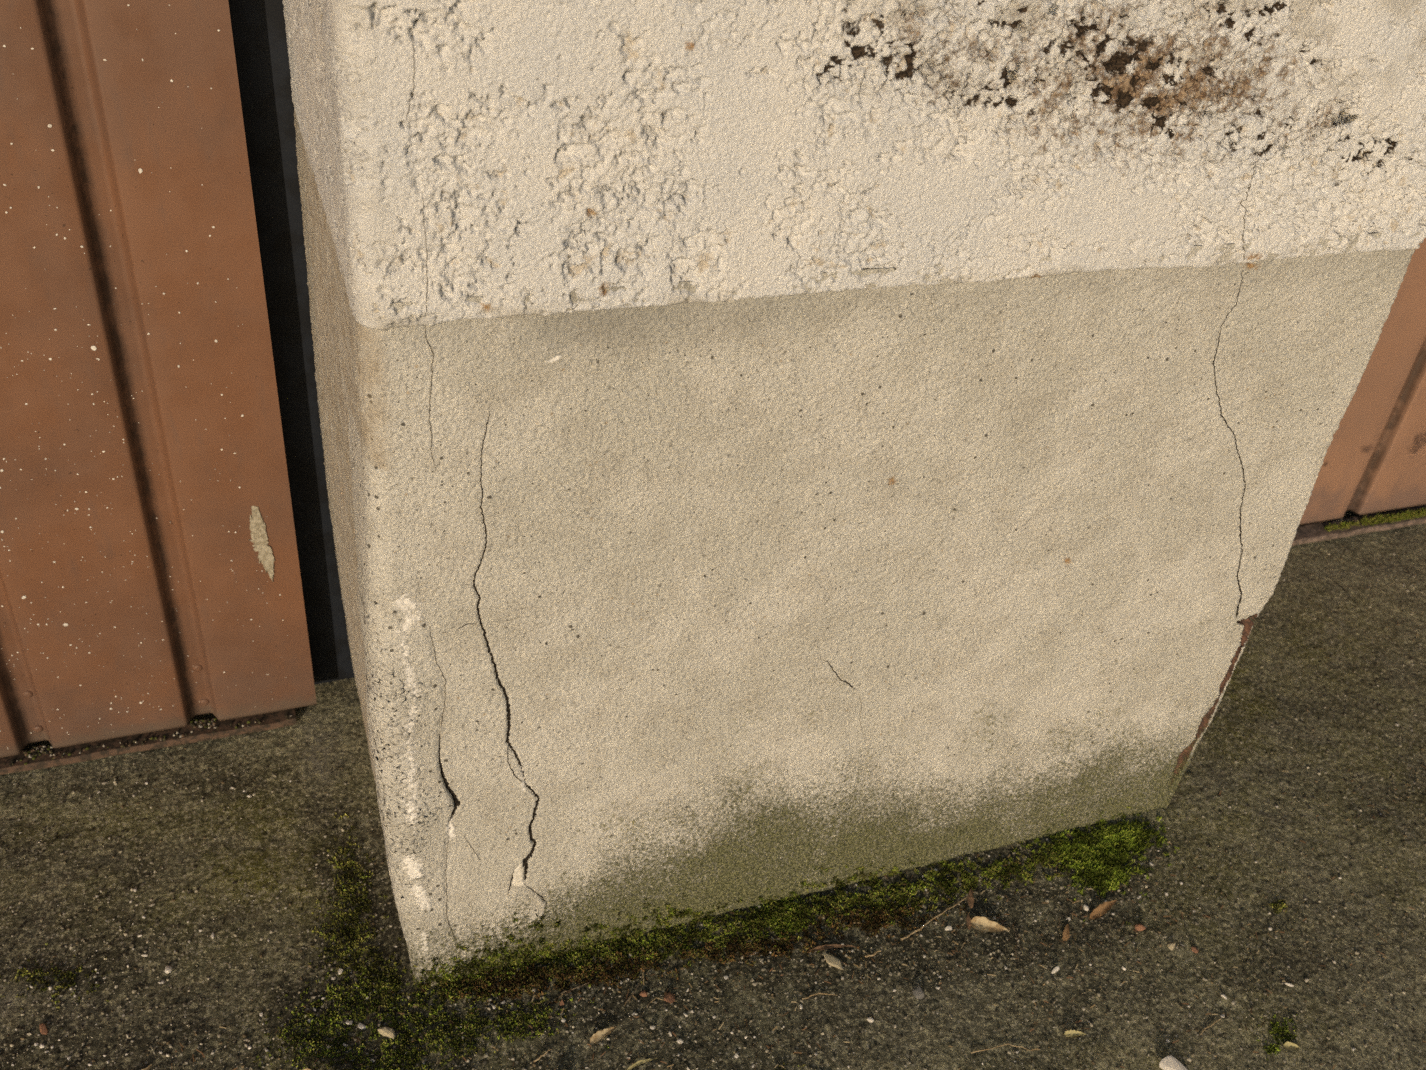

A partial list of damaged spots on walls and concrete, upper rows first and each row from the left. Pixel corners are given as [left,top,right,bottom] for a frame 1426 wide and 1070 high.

leakage [816,4,922,90]
leakage [944,61,1045,115]
leakage [970,1,1028,32]
leakage [1035,10,1235,139]
leakage [1181,0,1293,46]
leakage [1204,96,1295,157]
leakage [1324,102,1420,186]
crack [1213,161,1258,618]
leakage [393,594,423,836]
crack [430,414,547,941]
leakage [445,819,456,840]
leakage [395,854,580,988]